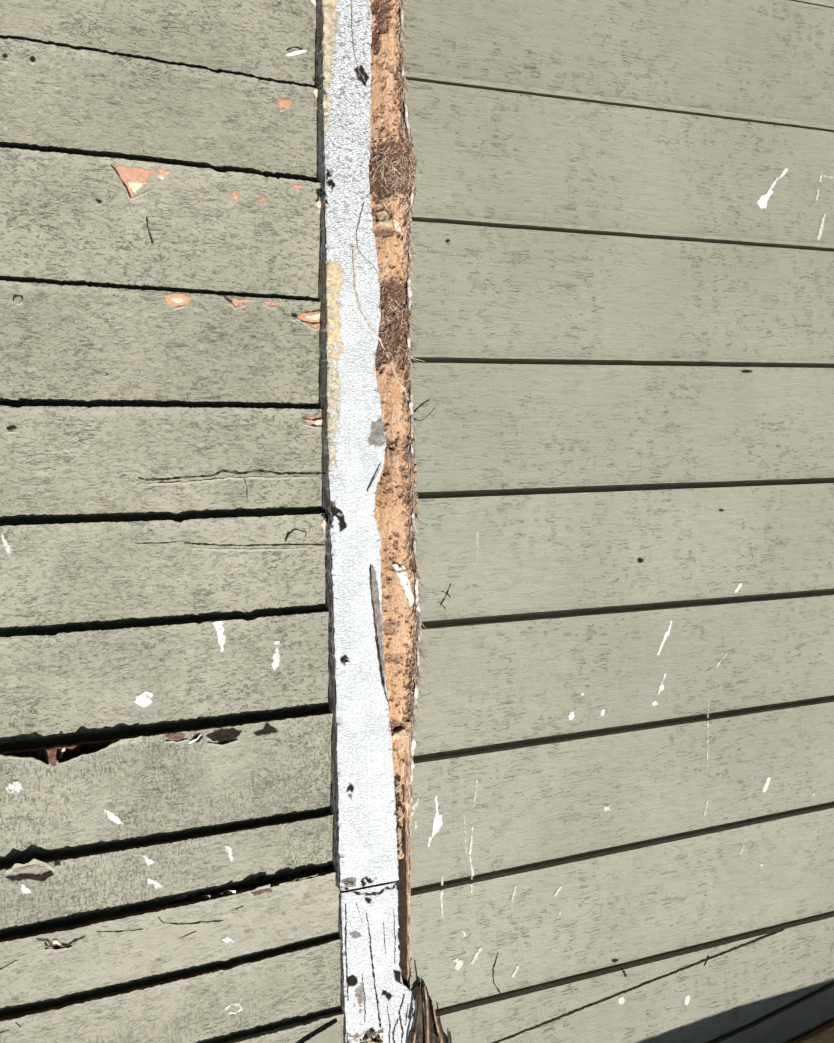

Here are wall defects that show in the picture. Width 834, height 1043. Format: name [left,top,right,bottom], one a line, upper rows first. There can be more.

spalling [111,164,172,201]
spalling [162,293,192,311]
spalling [224,296,281,310]
peeling [291,261,344,473]
crack [138,469,326,489]
crack [135,528,325,552]
hole [165,723,278,746]
peeling [0,736,142,768]
peeling [5,859,60,881]
crack [98,906,243,938]
crack [302,903,408,1043]
crack [492,929,784,1043]